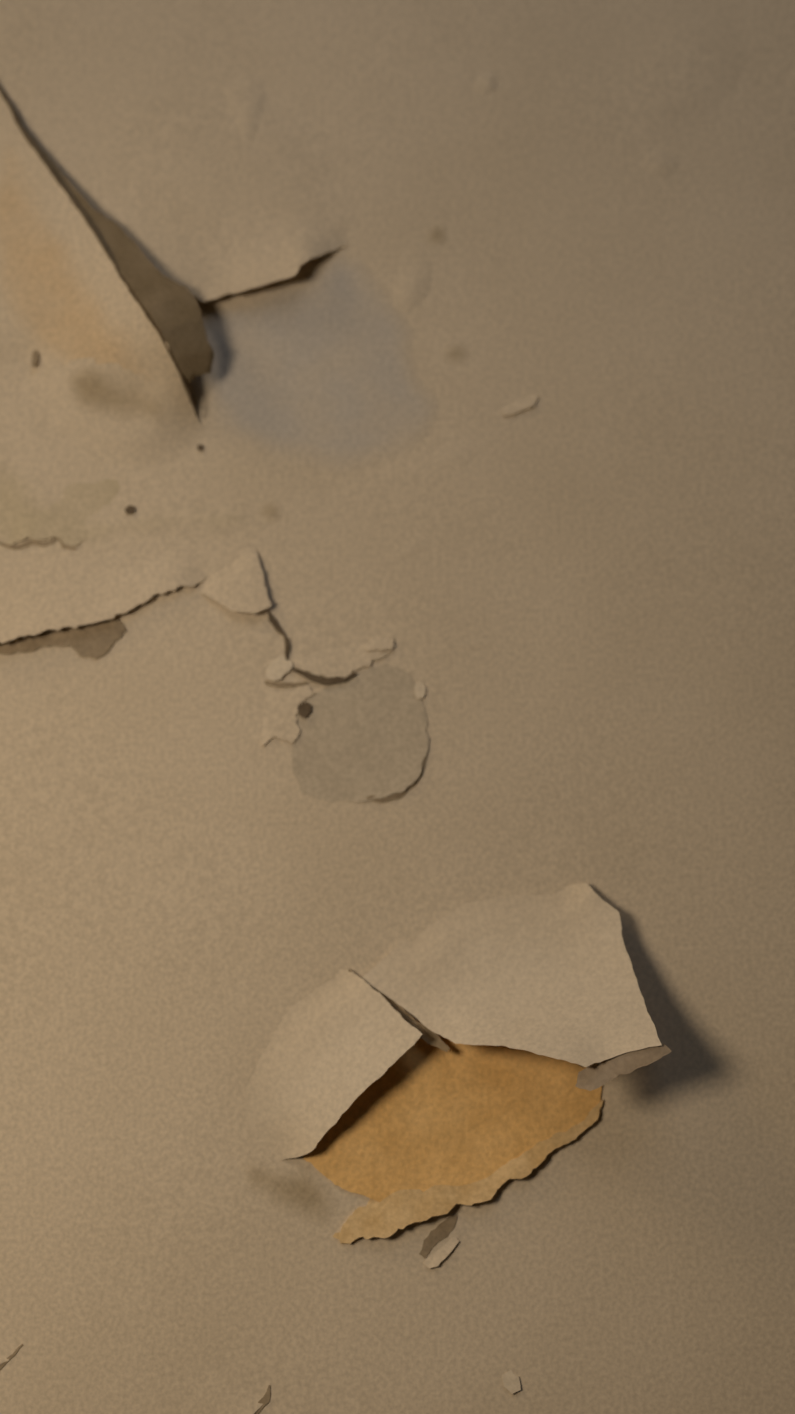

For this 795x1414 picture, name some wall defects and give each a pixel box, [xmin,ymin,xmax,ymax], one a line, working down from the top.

peeling [0,84,440,475]
peeling [0,545,271,660]
peeling [258,636,429,803]
peeling [245,883,672,1269]